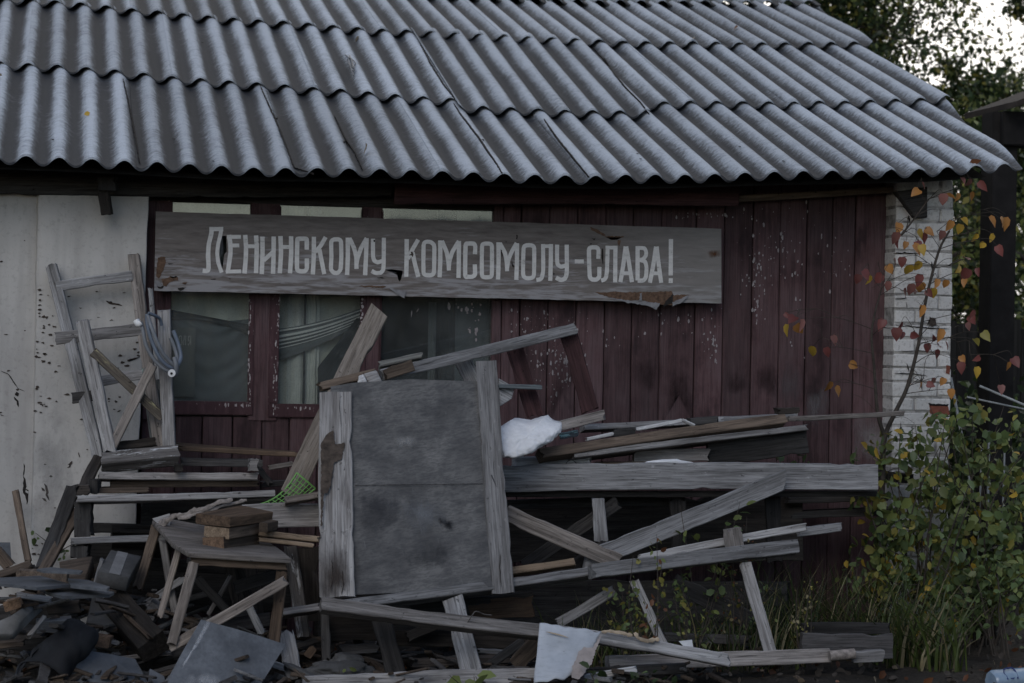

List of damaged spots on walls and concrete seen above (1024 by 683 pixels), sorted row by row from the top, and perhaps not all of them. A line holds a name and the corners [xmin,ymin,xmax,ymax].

spalling [34,289,60,373]